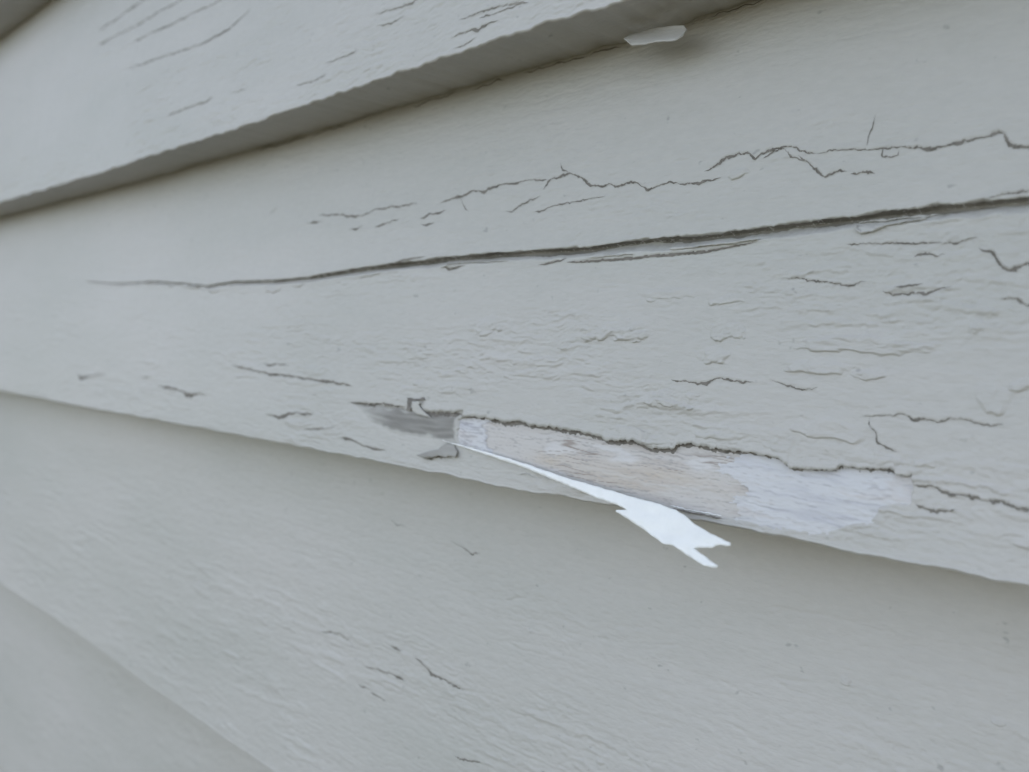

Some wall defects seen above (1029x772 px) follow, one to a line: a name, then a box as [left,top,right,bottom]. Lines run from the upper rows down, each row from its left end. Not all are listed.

crack [413,47,620,107]
crack [258,116,375,150]
crack [307,117,1029,231]
crack [96,190,1029,293]
crack [787,277,948,296]
peeling [355,397,913,568]